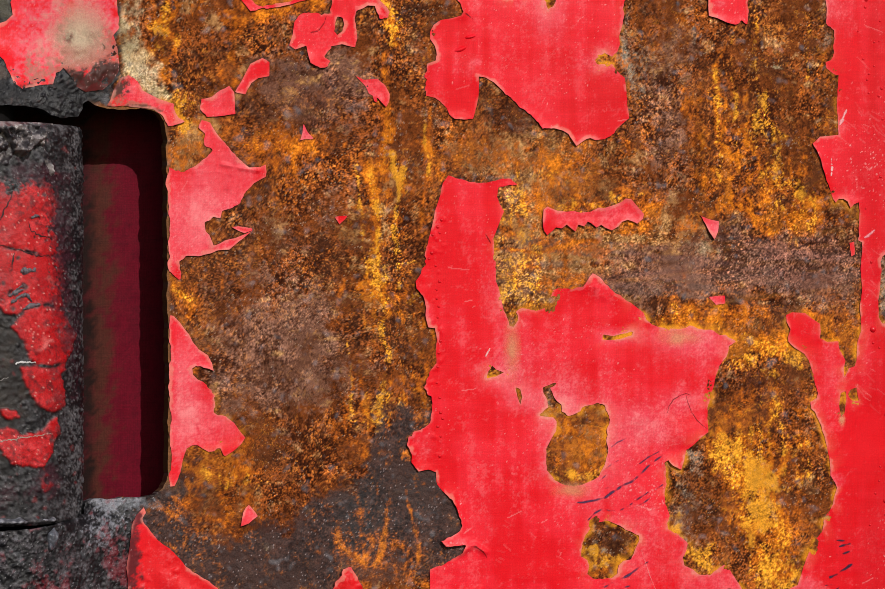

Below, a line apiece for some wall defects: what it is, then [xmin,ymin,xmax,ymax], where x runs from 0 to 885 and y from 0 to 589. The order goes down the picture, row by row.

peeling [329,12,344,35]
peeling [8,267,41,310]
corrosion [94,0,502,541]
corrosion [487,0,862,589]
peeling [603,327,633,340]
peeling [126,507,218,589]
peeling [333,567,363,589]
corrosion [362,576,430,589]